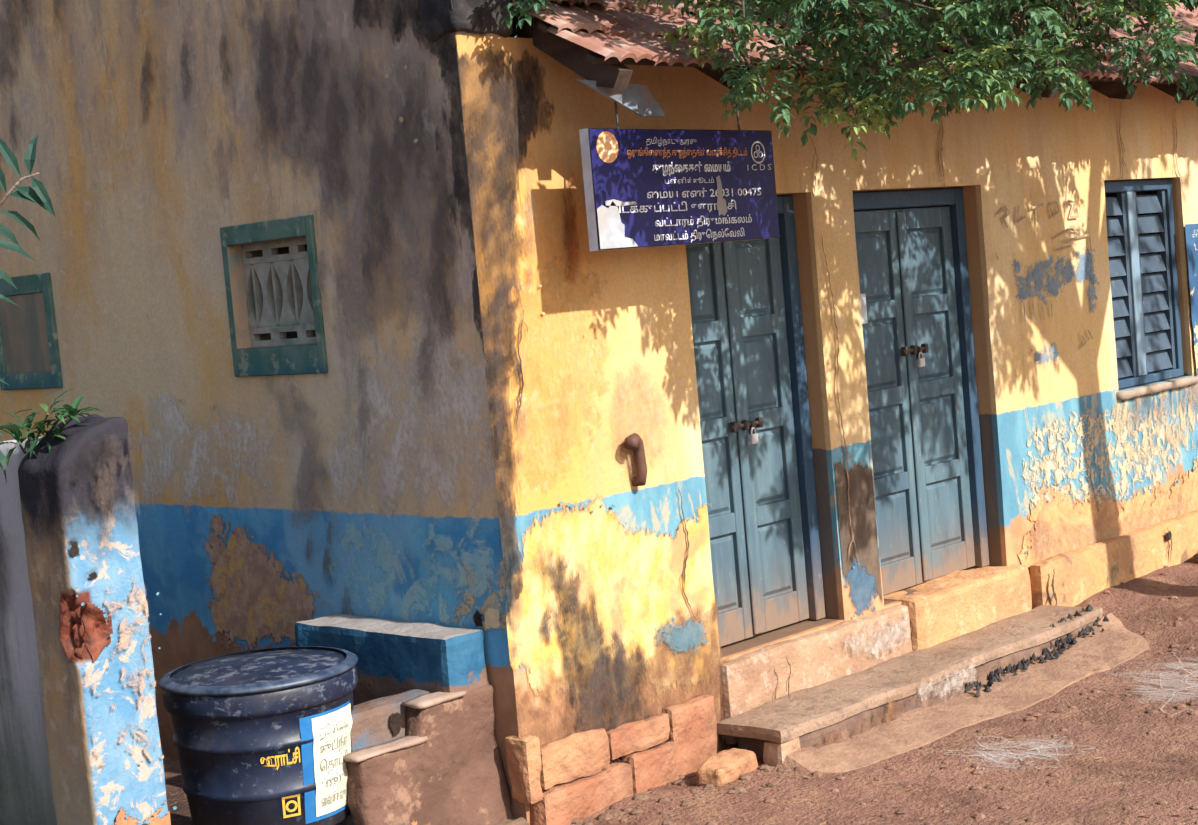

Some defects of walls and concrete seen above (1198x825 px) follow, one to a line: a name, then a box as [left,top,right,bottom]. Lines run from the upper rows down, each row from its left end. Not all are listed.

damp [252,0,554,620]
spalling [70,540,80,557]
spalling [59,572,161,710]
peeling [129,392,270,510]
peeling [200,514,325,653]
peeling [451,495,722,701]
damp [516,553,733,749]
crack [678,489,696,619]
crack [821,235,860,567]
peeling [1017,383,1198,582]
peeling [116,722,164,767]